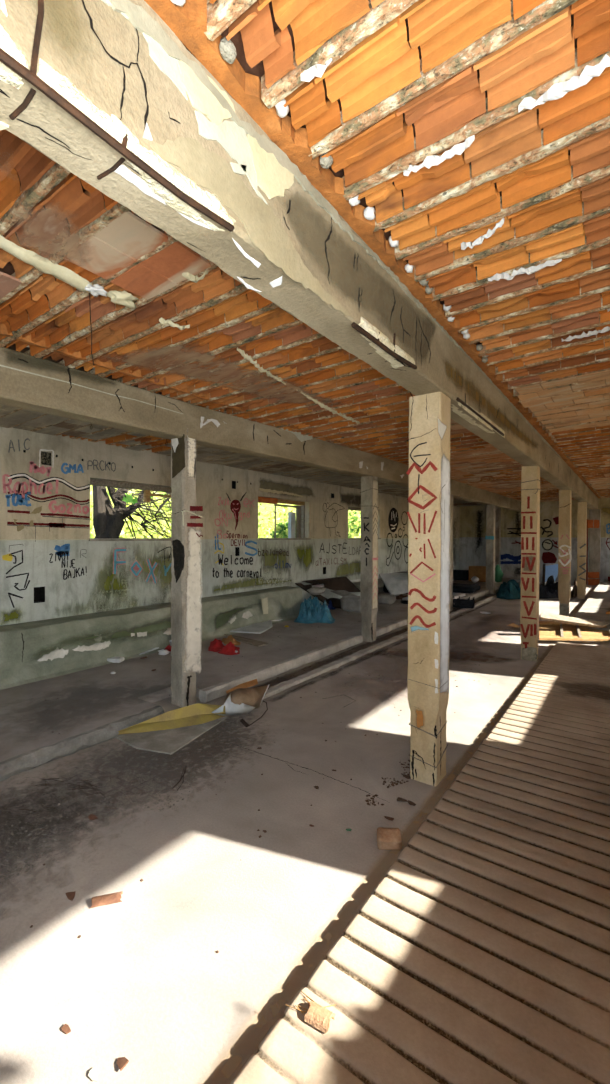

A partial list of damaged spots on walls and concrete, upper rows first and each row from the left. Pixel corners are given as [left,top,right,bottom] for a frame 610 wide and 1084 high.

crack [0,89,91,160]
crack [82,0,180,131]
peeling [0,0,562,459]
leakage [287,199,435,358]